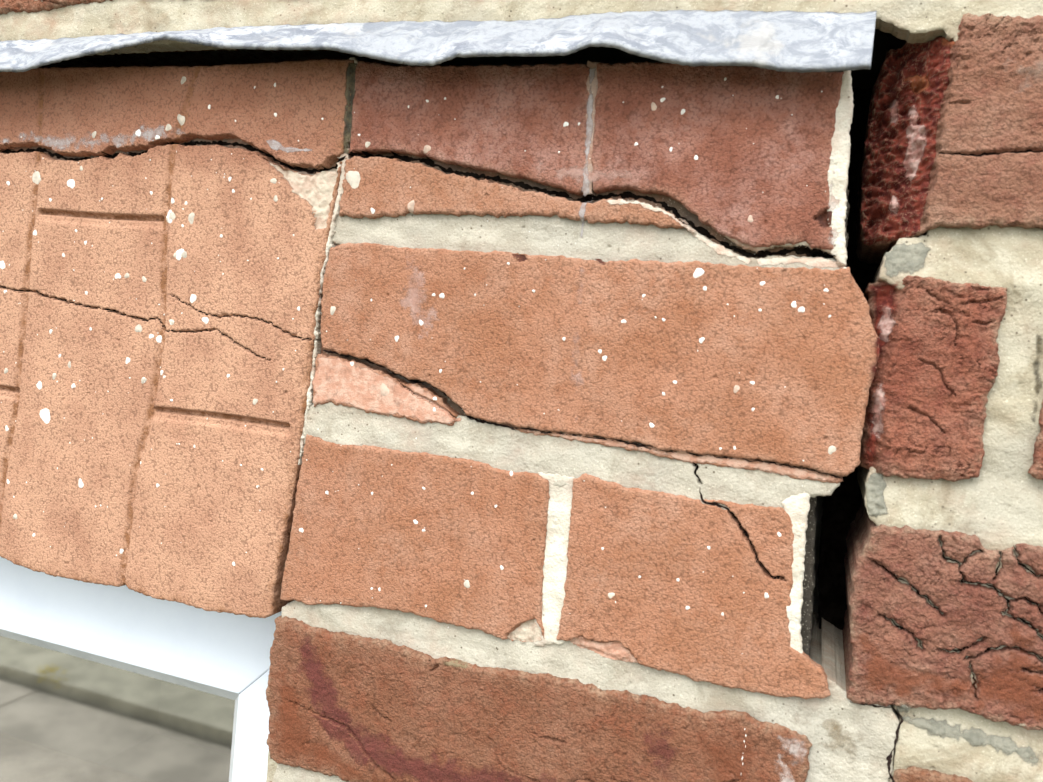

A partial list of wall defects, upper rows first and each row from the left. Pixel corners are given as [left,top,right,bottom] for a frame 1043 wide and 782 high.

crack [0,87,881,293]
crack [0,286,863,630]
crack [875,536,1043,697]
crack [851,702,904,782]